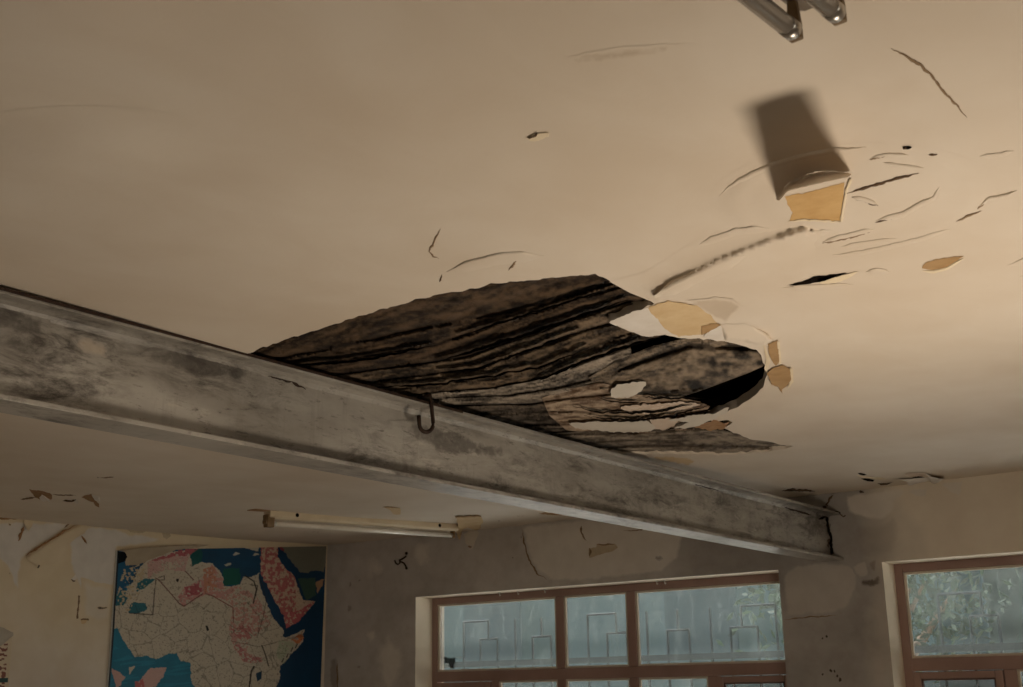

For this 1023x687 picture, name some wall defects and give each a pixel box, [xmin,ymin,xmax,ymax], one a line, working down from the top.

crack [891,48,967,117]
crack [822,146,937,244]
crack [956,204,984,222]
peeling [922,256,964,273]
water stain [0,307,115,362]
water stain [132,347,261,393]
peeling [610,301,794,394]
peeling [569,381,729,433]
water stain [388,417,521,463]
peeling [21,489,100,507]
crack [783,488,846,554]
peeling [0,521,162,623]